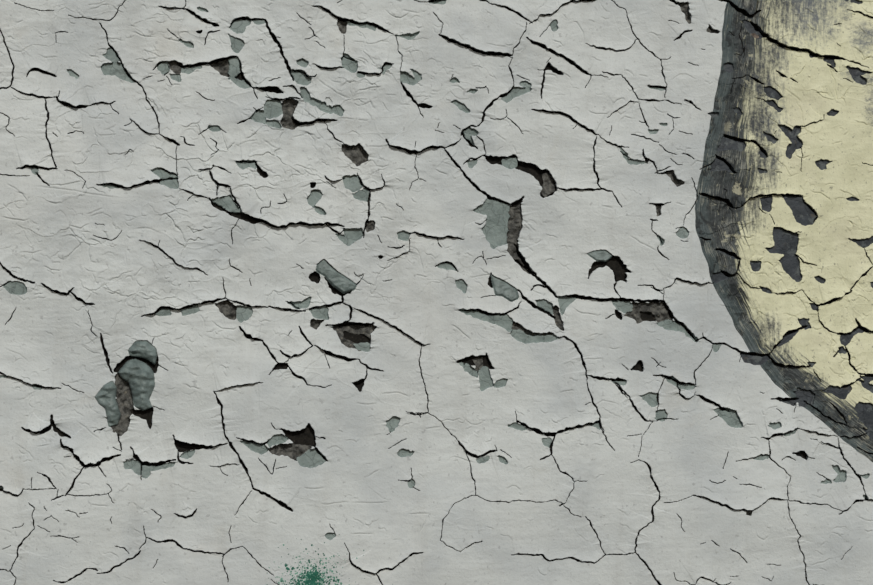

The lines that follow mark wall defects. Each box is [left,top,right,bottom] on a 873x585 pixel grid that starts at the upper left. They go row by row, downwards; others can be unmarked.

crack [0,0,180,175]
peeling [141,259,377,352]
peeling [237,5,464,261]
spalling [445,125,557,198]
crack [414,0,701,207]
spalling [458,197,698,344]
crack [638,236,873,382]
peeling [759,194,826,283]
crack [0,414,122,585]
crack [53,326,383,585]
spalling [123,423,328,480]
crack [344,307,873,585]